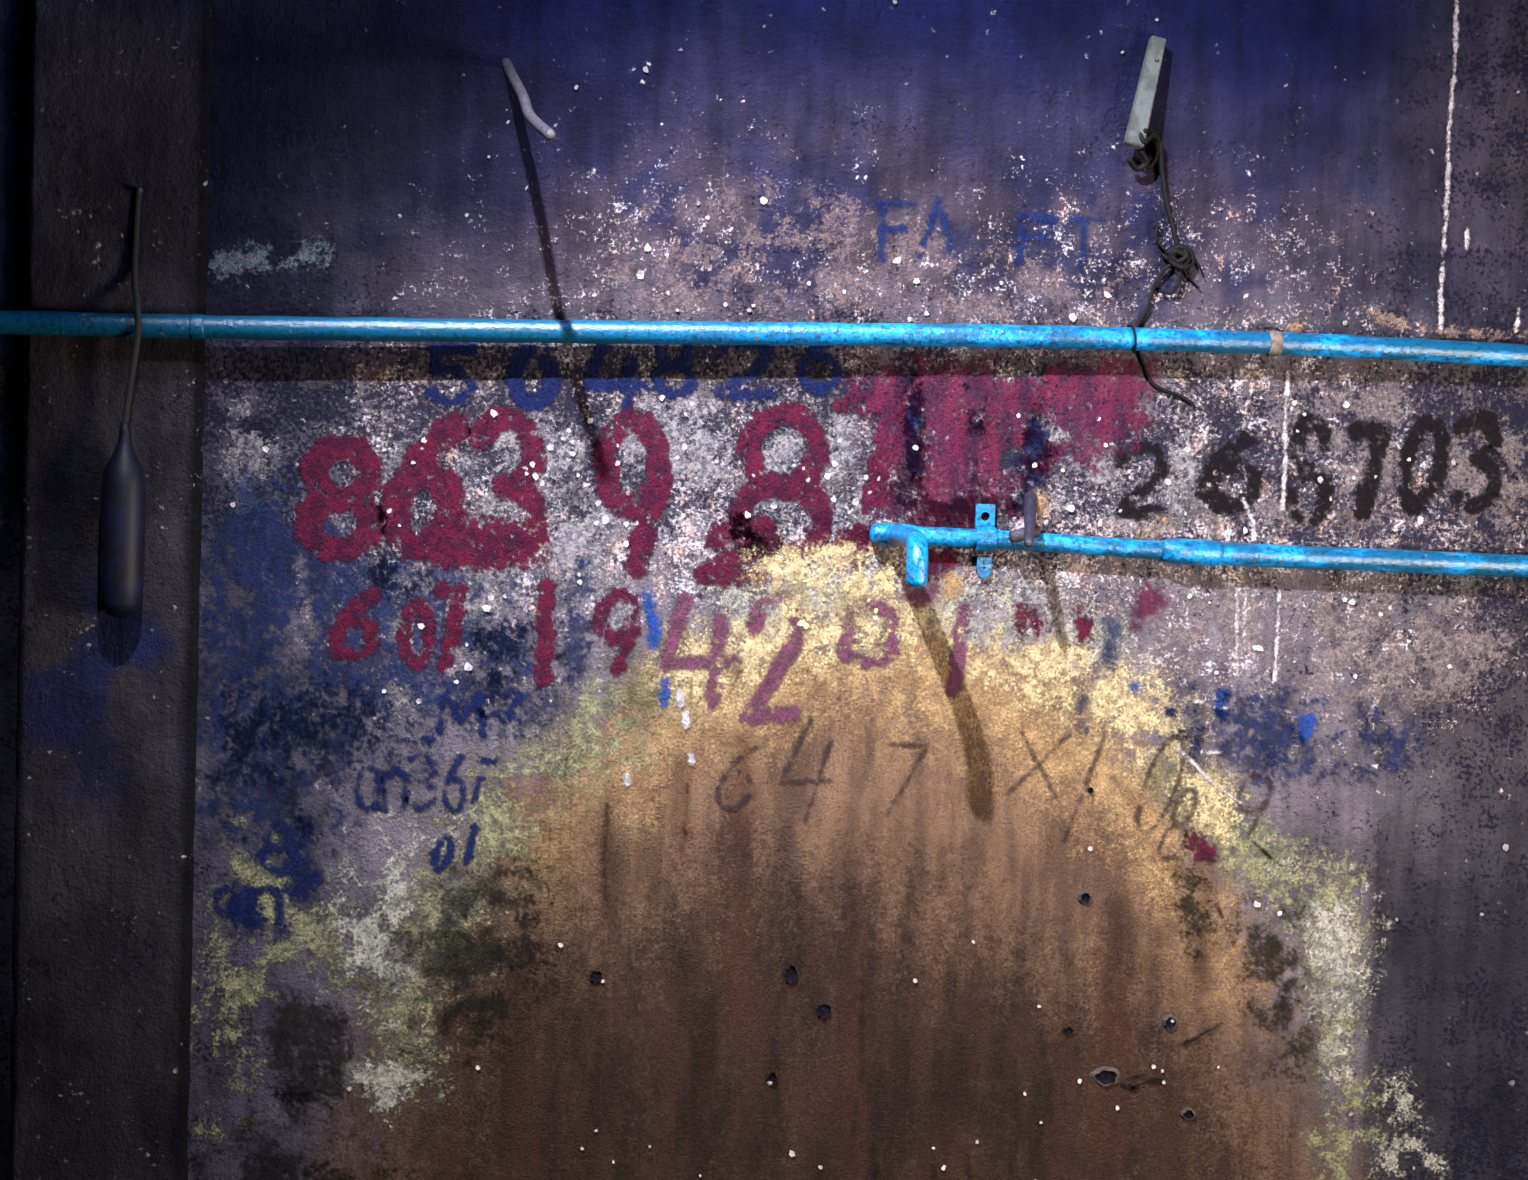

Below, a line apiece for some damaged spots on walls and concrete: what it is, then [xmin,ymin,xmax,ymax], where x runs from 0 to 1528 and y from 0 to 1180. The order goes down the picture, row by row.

leakage [187,555,1448,1180]